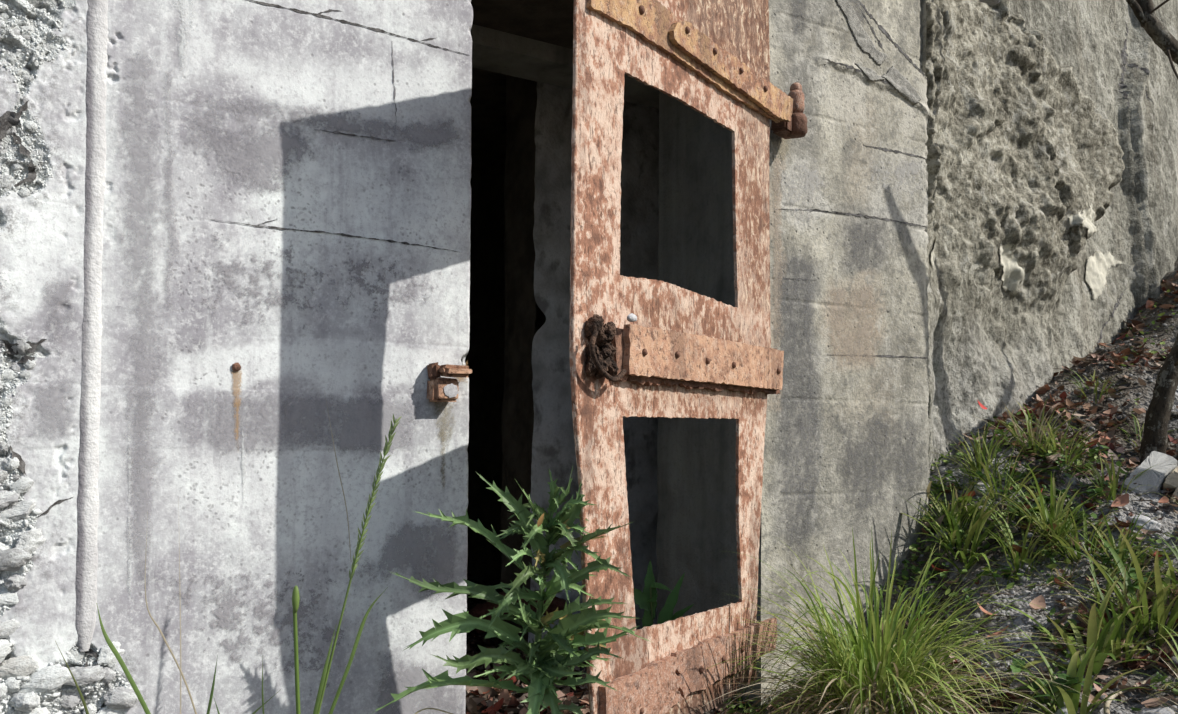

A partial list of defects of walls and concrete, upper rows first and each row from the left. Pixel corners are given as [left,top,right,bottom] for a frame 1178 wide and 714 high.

spalling [0,0,77,231]
leakage [188,101,459,191]
crack [827,59,889,83]
crack [859,1,930,119]
peeling [1067,203,1097,240]
peeling [1000,242,1025,295]
peeling [1086,251,1122,299]
rust [232,370,245,494]
leakage [189,396,416,453]
spalling [0,311,138,714]